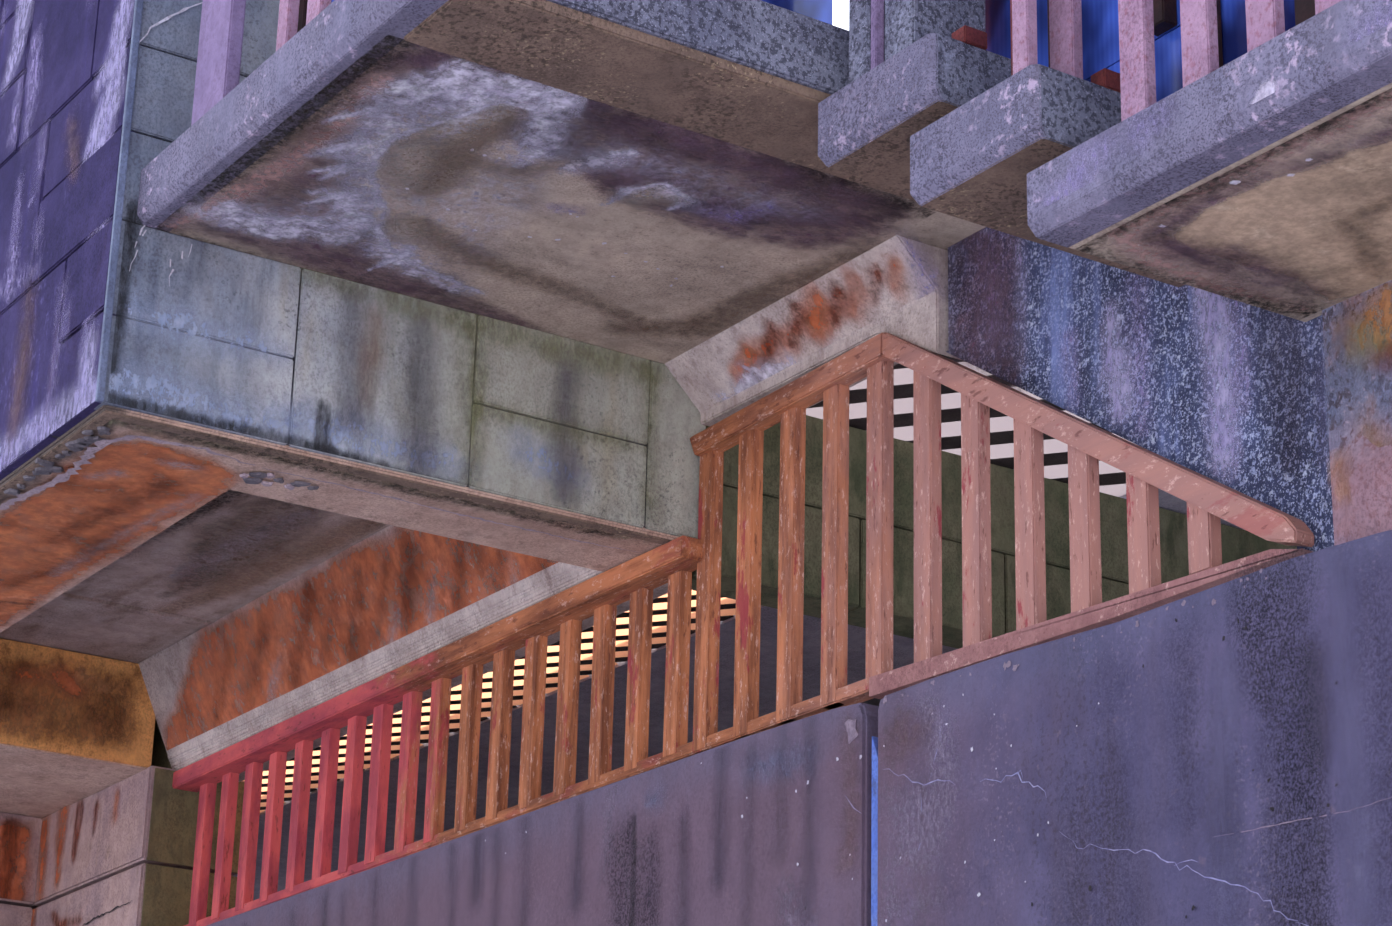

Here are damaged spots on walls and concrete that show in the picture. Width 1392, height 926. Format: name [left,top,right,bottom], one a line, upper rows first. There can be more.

leakage [86,0,132,159]
leakage [162,43,931,335]
leakage [0,313,610,535]
rust [736,276,848,382]
rust [871,259,898,297]
leakage [1080,89,1392,468]
rust [1342,284,1392,407]
rust [0,442,234,626]
rust [165,528,558,751]
rust [0,801,98,926]
crack [1060,832,1308,926]